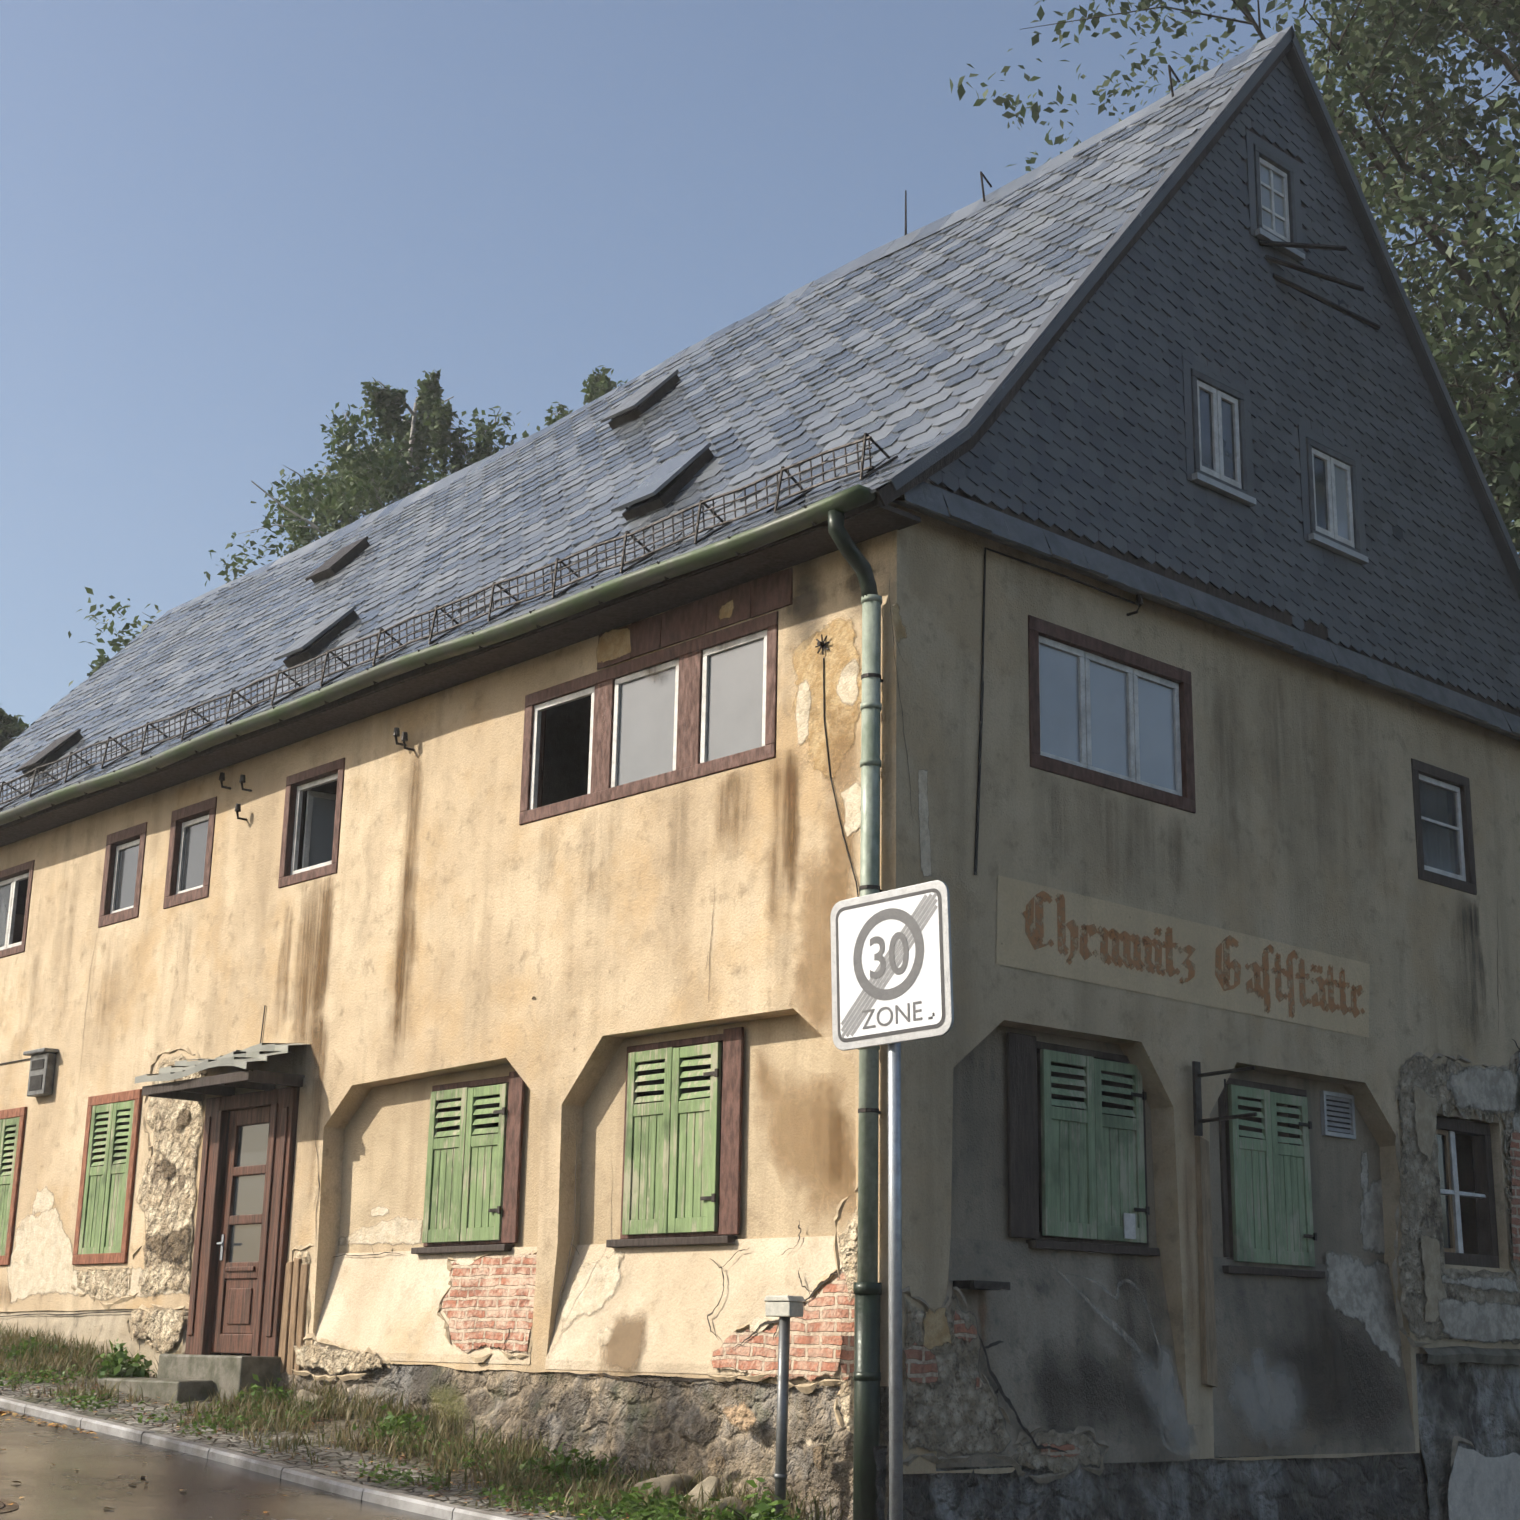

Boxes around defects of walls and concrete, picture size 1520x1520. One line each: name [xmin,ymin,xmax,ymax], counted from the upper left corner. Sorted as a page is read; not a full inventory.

peeling [792,618,862,836]
water stain [285,888,331,1079]
water stain [396,917,413,1023]
spalling [7,1045,207,1354]
spalling [437,1250,537,1363]
water stain [600,1318,644,1371]
crack [548,1115,843,1399]
spalling [706,1182,858,1434]
spalling [902,1280,1110,1483]
water stain [1039,1353,1177,1429]
water stain [1285,1314,1394,1424]
spalling [1326,1050,1520,1367]